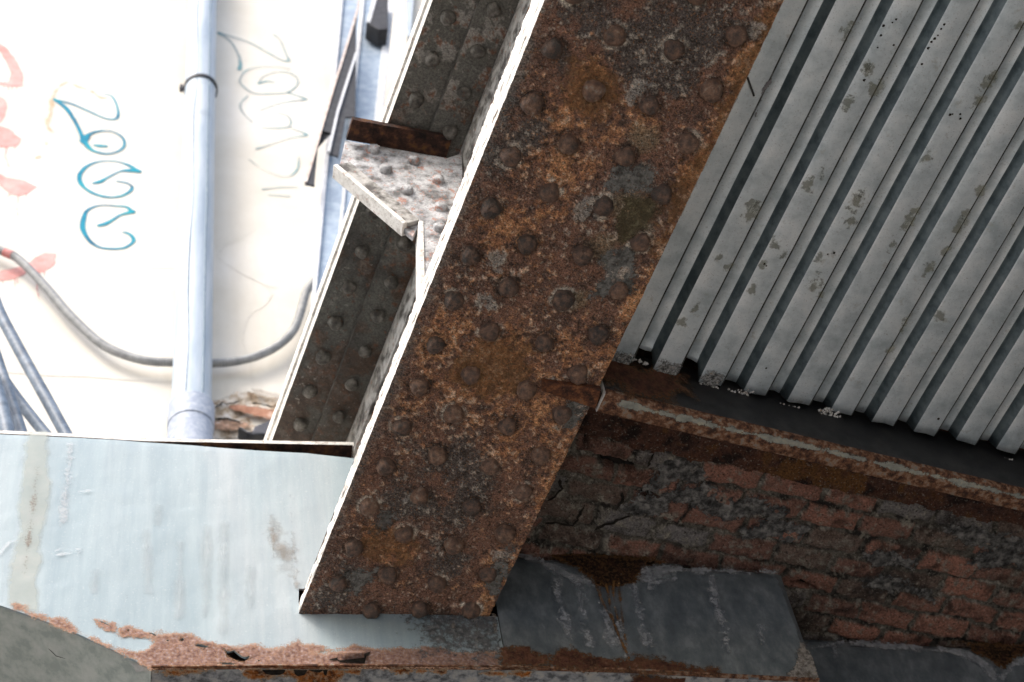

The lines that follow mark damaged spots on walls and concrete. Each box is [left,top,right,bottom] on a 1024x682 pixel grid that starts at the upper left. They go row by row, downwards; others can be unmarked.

corrosion [577,351,1024,529]
crack [545,479,630,531]
corrosion [11,553,722,682]